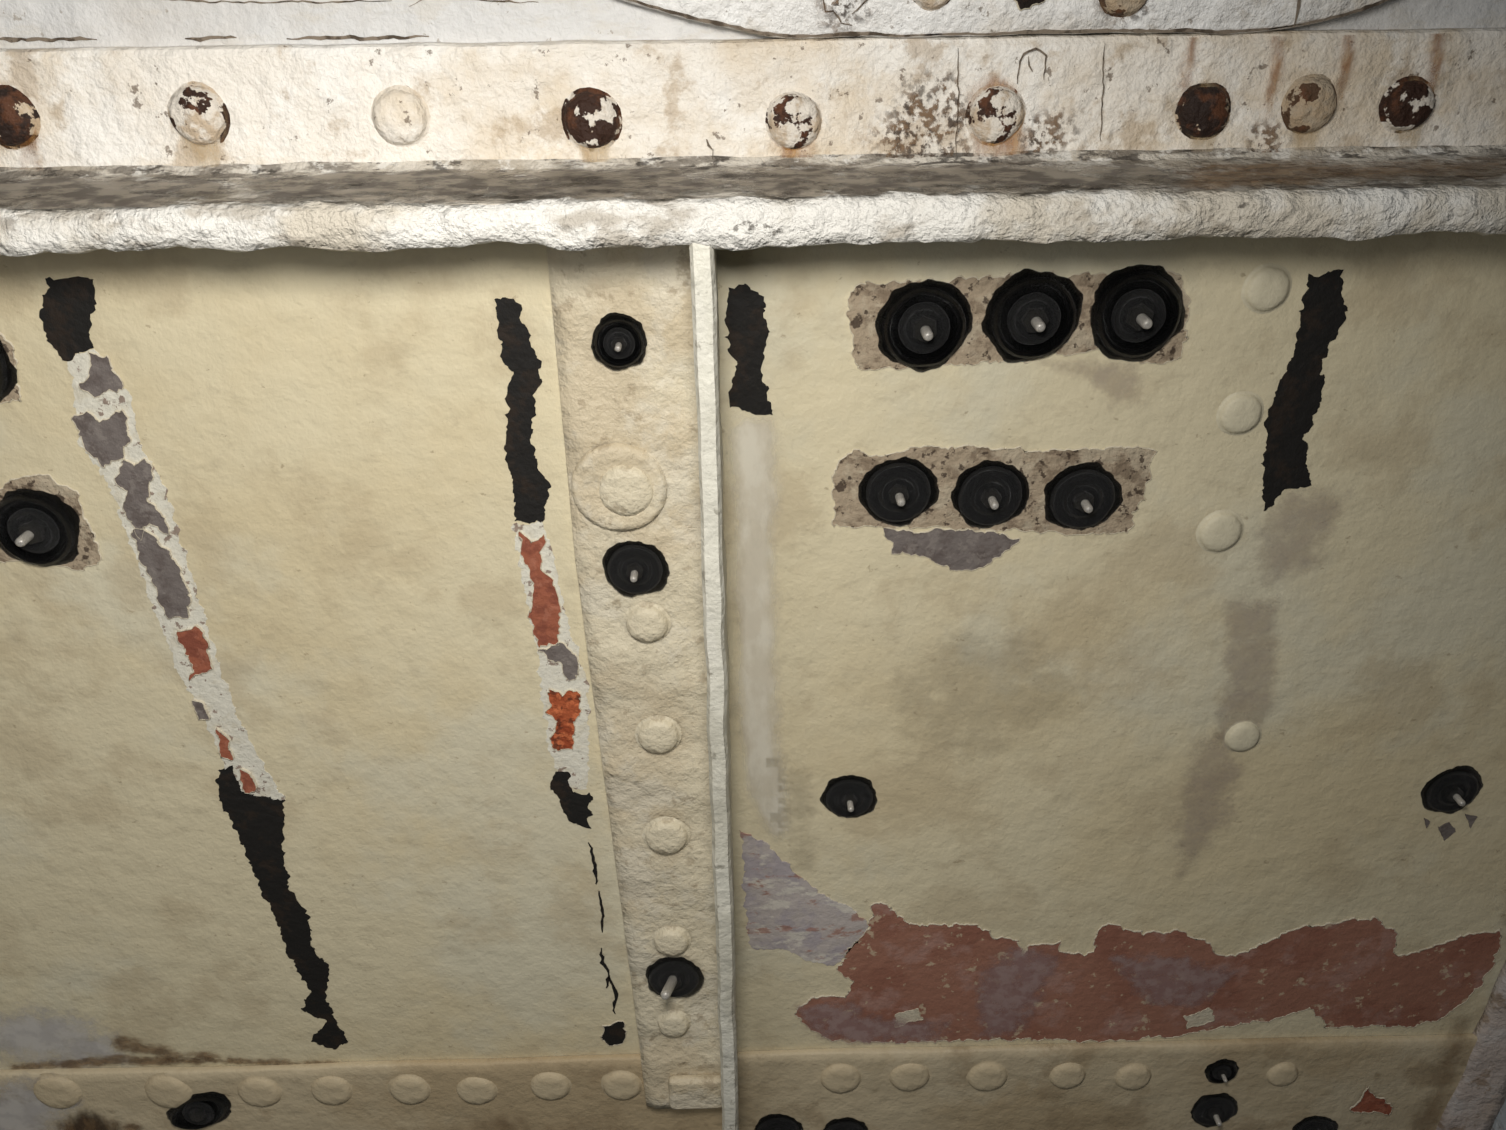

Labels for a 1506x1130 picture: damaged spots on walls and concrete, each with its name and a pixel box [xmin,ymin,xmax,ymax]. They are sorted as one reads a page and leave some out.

corrosion [881,75,971,159]
corrosion [989,113,1066,155]
corrosion [1250,124,1282,153]
peeling [0,331,22,404]
peeling [0,473,102,571]
peeling [494,297,593,829]
peeling [39,276,348,1050]
peeling [1424,814,1477,841]
peeling [739,830,1502,1044]
water stain [63,1113,139,1130]